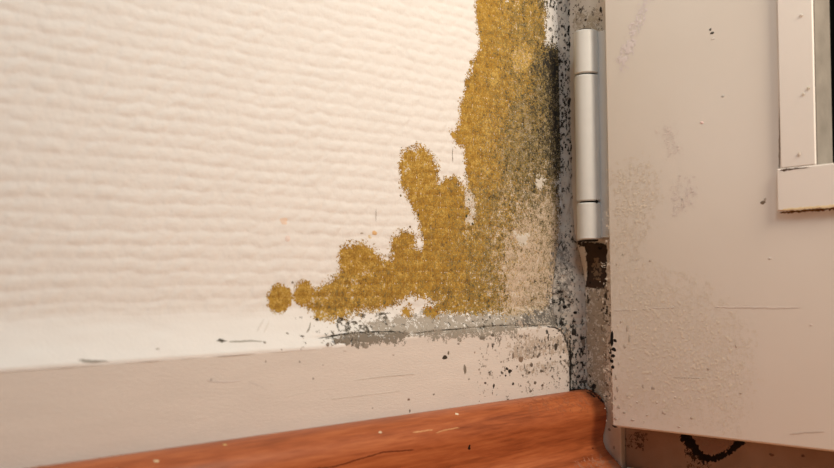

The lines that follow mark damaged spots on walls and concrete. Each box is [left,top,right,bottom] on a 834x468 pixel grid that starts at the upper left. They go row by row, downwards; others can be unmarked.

damp [266,0,764,468]